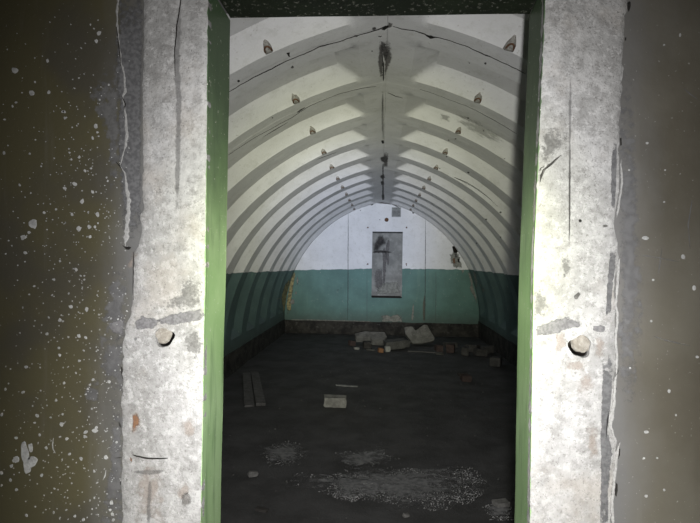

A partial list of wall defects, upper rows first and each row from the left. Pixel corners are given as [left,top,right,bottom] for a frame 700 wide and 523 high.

peeling [0,0,143,523]
crack [116,0,131,250]
crack [173,0,181,67]
crack [229,25,525,155]
crack [379,140,387,200]
damp [378,44,391,76]
crack [539,132,566,182]
crack [565,171,573,235]
peeling [606,131,649,357]
peeling [600,359,612,523]